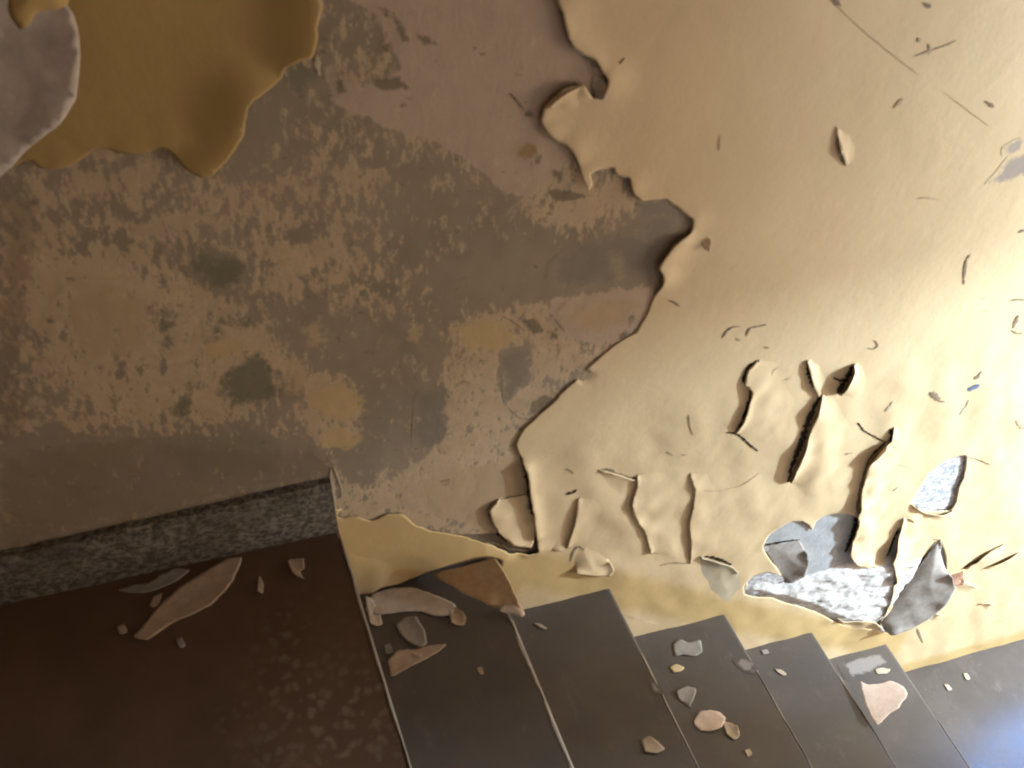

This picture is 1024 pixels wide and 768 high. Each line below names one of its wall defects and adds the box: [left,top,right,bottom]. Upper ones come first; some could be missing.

damp [0,164,350,551]
peeling [0,0,693,640]
spalling [598,427,1021,635]